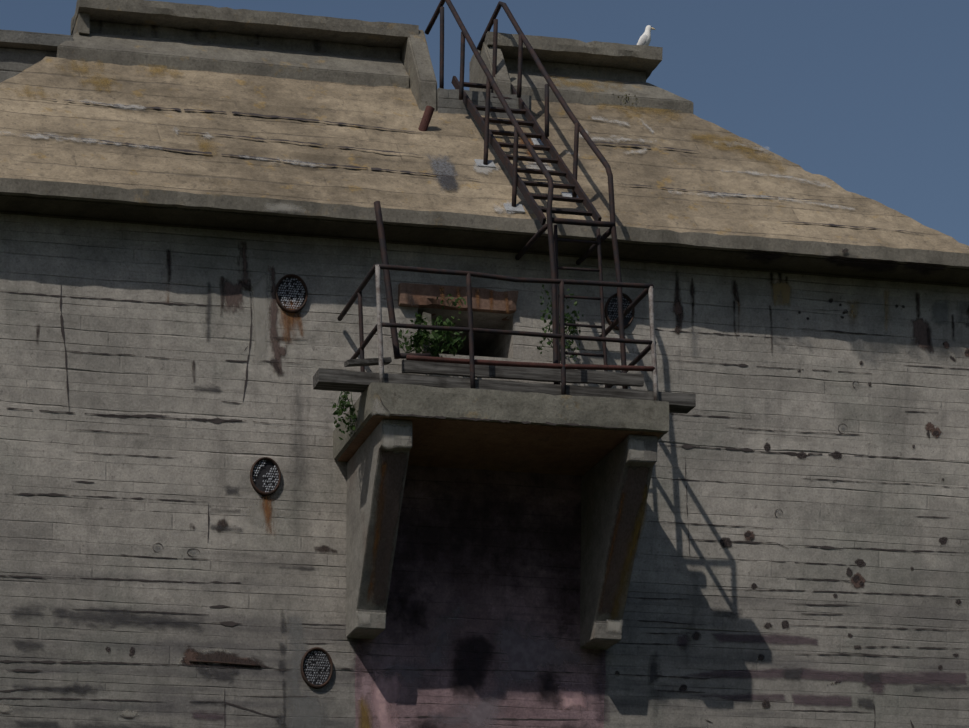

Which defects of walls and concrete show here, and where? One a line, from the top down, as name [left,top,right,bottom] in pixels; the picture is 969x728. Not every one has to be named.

rust [673,275,695,334]
leakage [373,424,411,607]
leakage [360,601,448,728]
leakage [420,620,585,728]